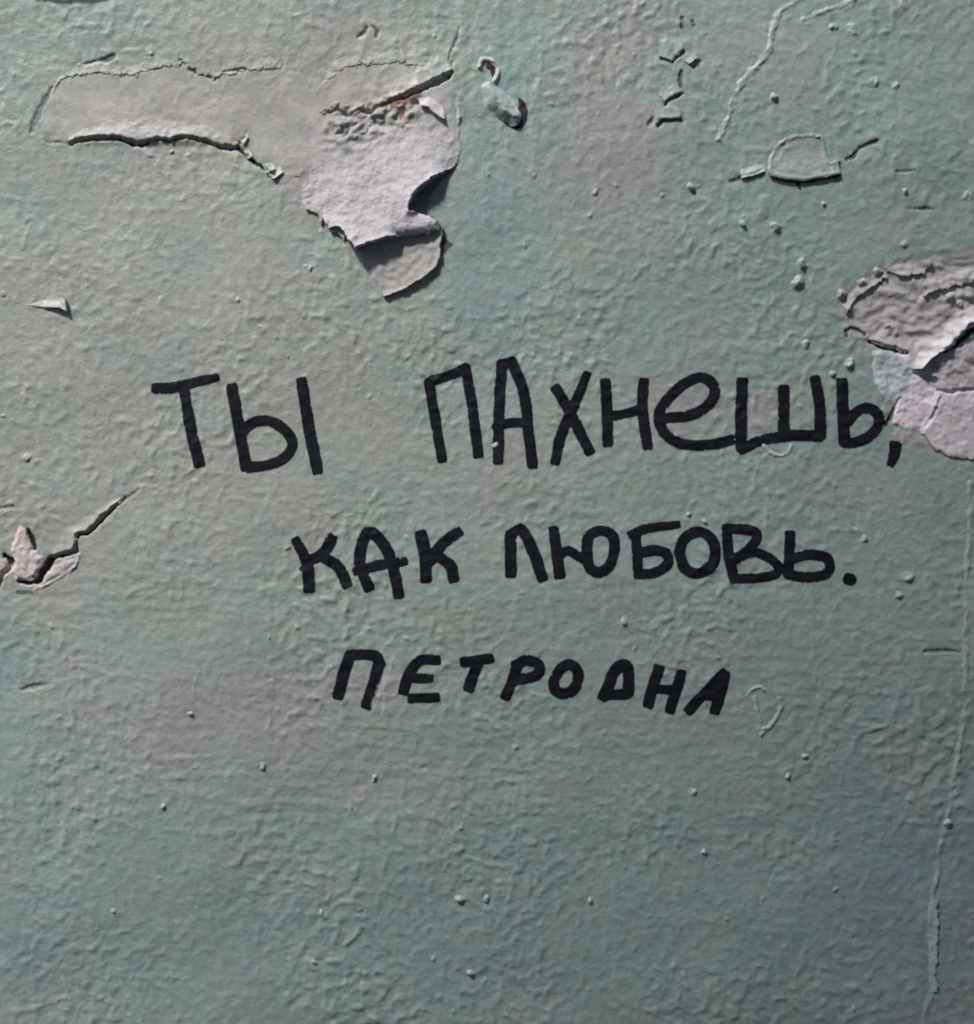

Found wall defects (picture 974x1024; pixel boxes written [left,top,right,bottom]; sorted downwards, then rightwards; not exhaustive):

crack [46,116,283,179]
peeling [41,47,463,297]
peeling [28,294,68,311]
spalling [837,260,974,460]